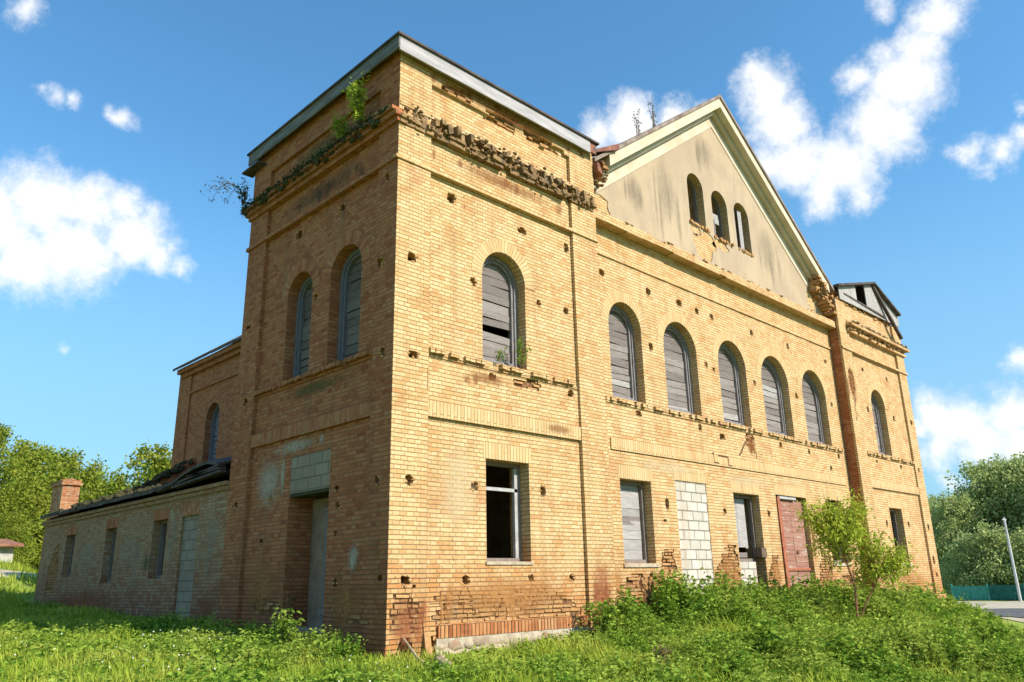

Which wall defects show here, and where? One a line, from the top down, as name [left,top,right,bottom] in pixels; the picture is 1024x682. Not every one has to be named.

spalling [441,83,557,155]
spalling [413,112,612,215]
flaking render [691,223,729,264]
spalling [806,275,848,323]
spalling [513,380,540,391]
spalling [715,545,740,588]
spalling [389,549,678,656]